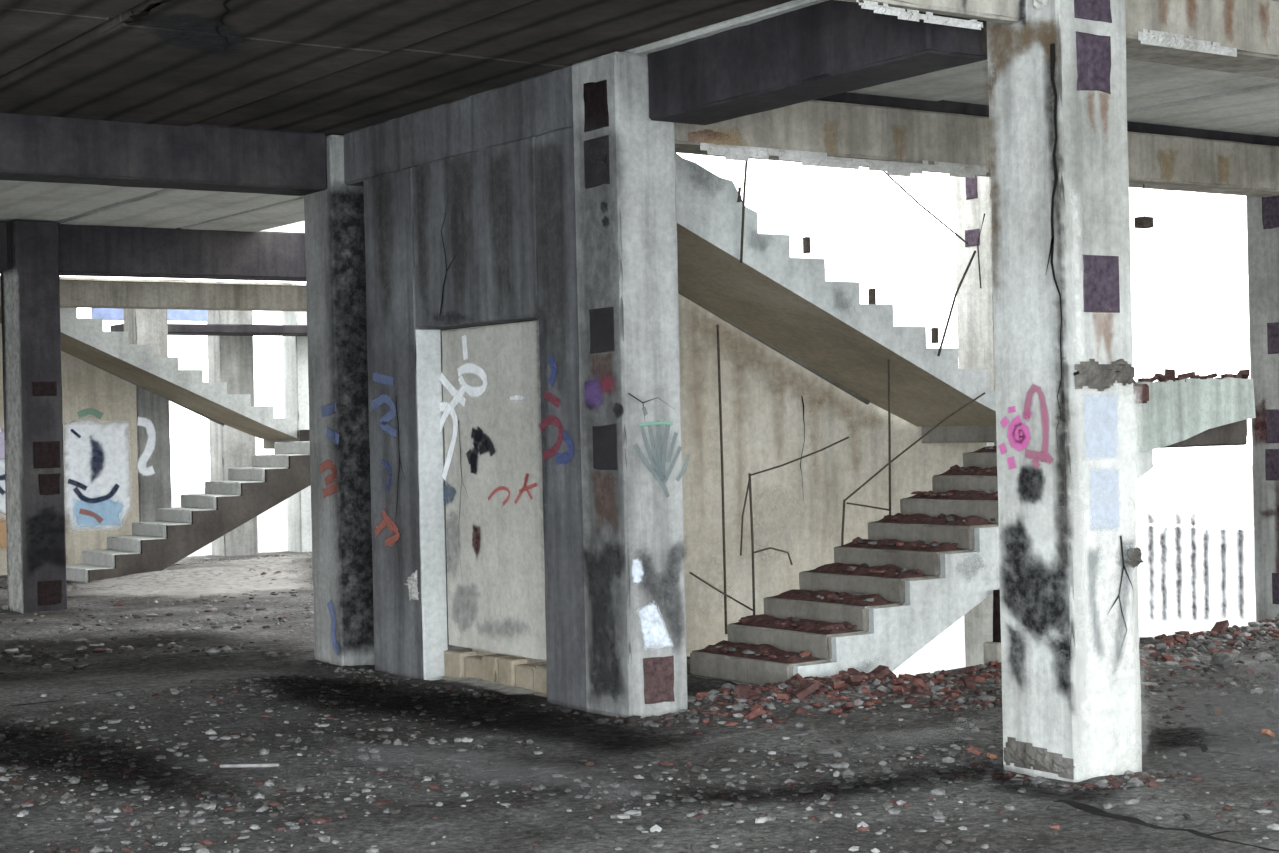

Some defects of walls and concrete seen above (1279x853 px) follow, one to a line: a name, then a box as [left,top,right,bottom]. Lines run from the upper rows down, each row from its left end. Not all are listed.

crack [1046,43,1121,445]
peeling [1075,359,1144,767]